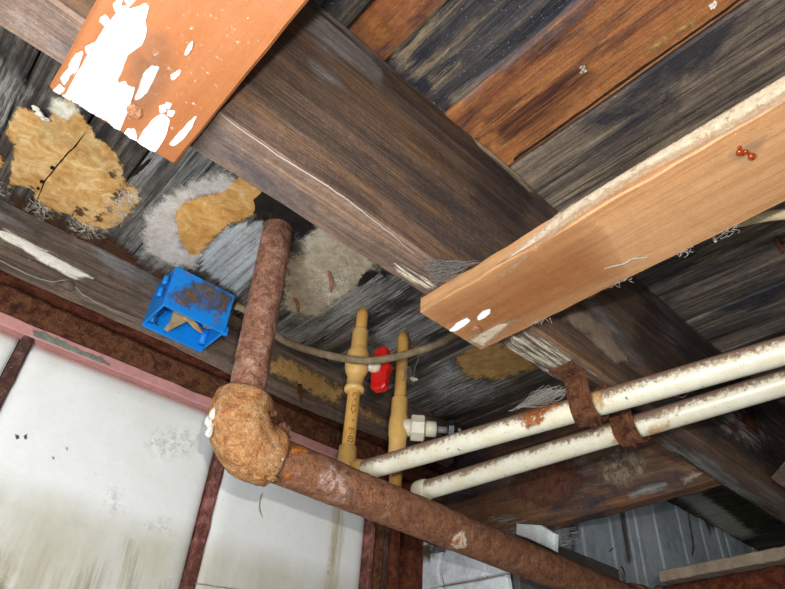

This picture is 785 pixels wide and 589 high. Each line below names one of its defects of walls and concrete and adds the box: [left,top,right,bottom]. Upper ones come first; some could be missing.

peeling [53,0,196,152]
crack [36,133,85,202]
rust [204,219,652,589]